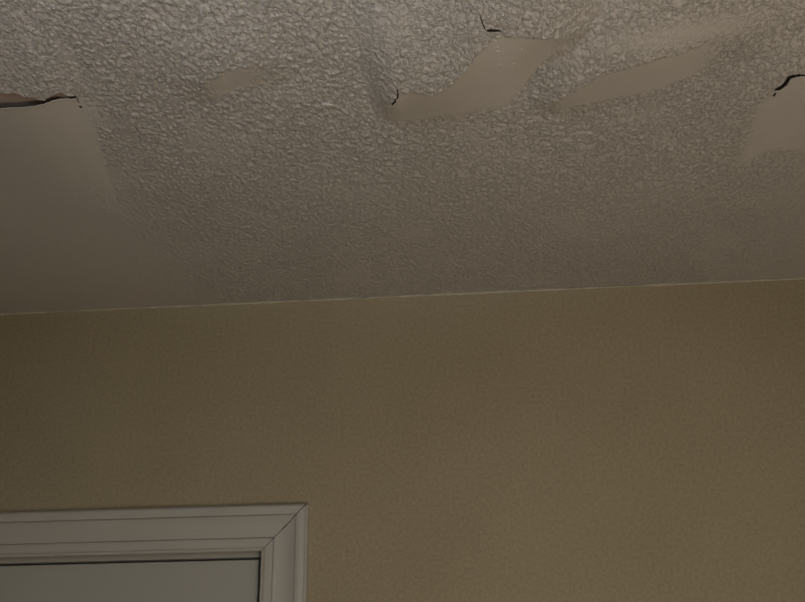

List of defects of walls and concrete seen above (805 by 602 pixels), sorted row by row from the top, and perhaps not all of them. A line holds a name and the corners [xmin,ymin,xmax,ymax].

crack [773,74,805,96]